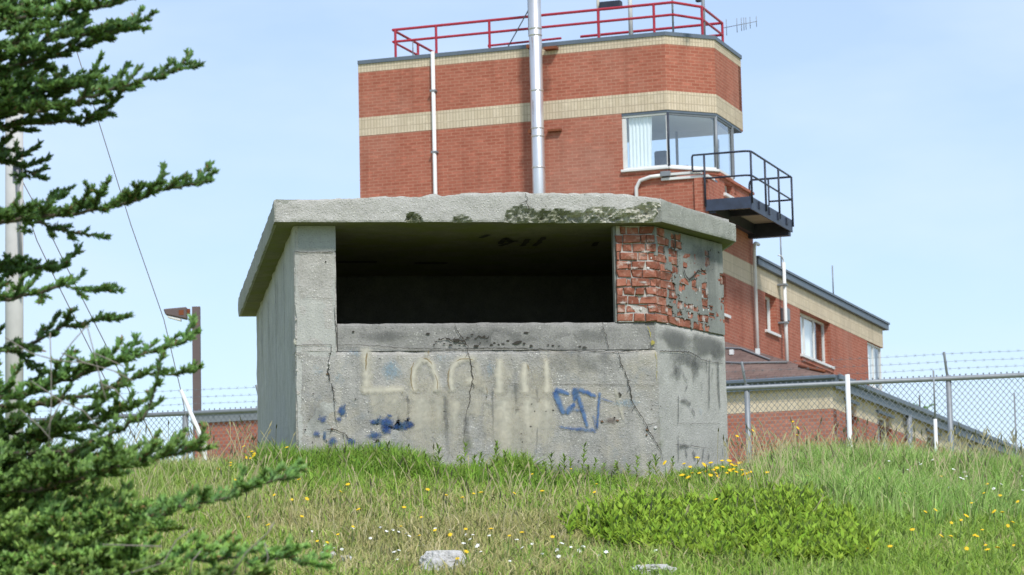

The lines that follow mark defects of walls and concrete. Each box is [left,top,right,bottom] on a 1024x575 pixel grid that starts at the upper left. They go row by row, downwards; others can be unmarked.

peeling [504,202,725,335]
crack [326,345,350,439]
crack [455,326,474,433]
crack [603,328,663,460]